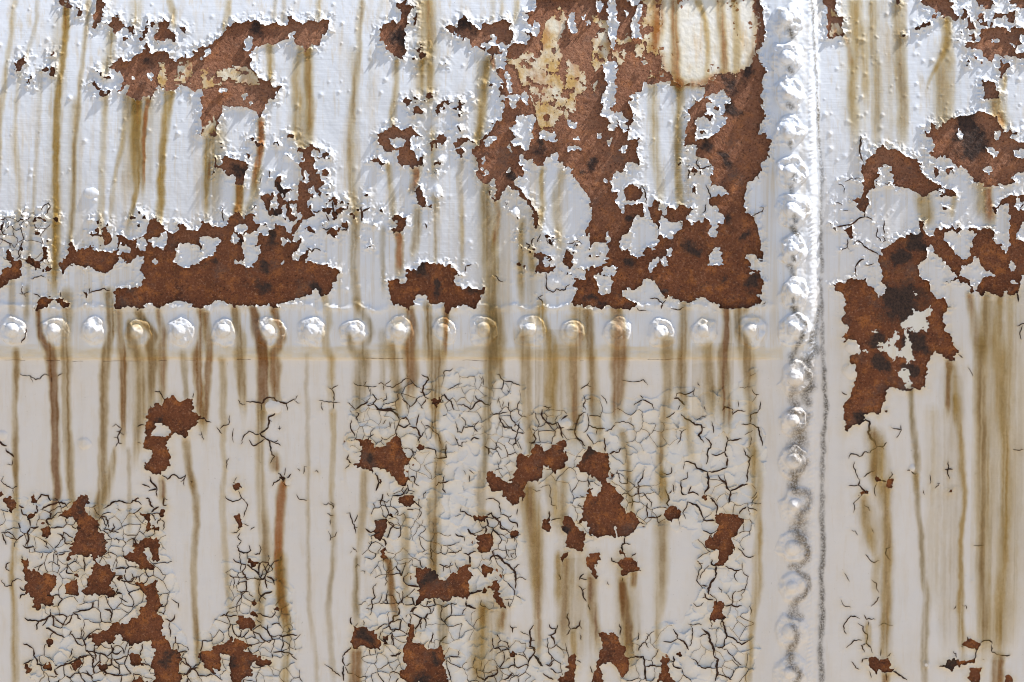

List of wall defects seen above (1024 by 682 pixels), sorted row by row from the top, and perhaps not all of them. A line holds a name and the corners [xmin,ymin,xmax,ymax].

peeling [0,0,359,311]
peeling [370,0,772,314]
peeling [833,0,1024,432]
peeling [21,494,183,682]
peeling [143,395,201,475]
peeling [198,600,272,682]
crack [0,369,763,682]
peeling [344,436,425,507]
peeling [399,623,449,682]
peeling [410,515,506,608]
peeling [486,440,644,579]
peeling [705,513,744,566]